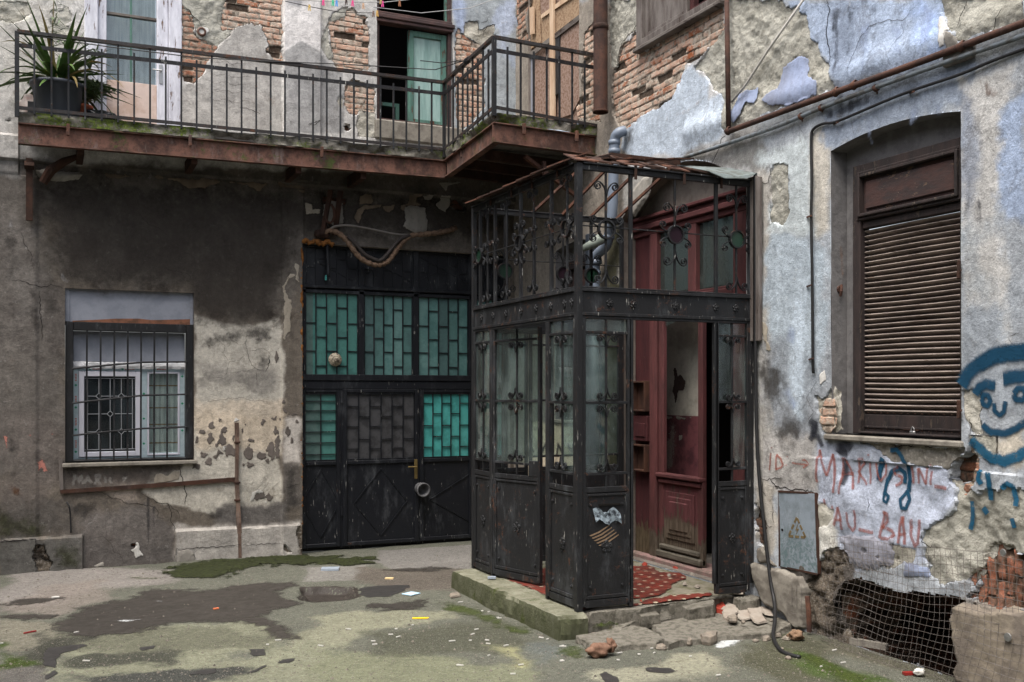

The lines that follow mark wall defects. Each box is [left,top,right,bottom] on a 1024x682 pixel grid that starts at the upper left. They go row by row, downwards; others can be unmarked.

flaking render [182,0,283,83]
flaking render [321,7,375,138]
flaking render [610,0,835,130]
flaking render [770,164,790,225]
peeling [192,400,300,470]
flaking render [817,371,843,434]
flaking render [33,545,52,572]
rust [59,423,242,558]
crack [102,468,280,559]
peeling [251,489,273,503]
flaking render [808,390,1024,644]